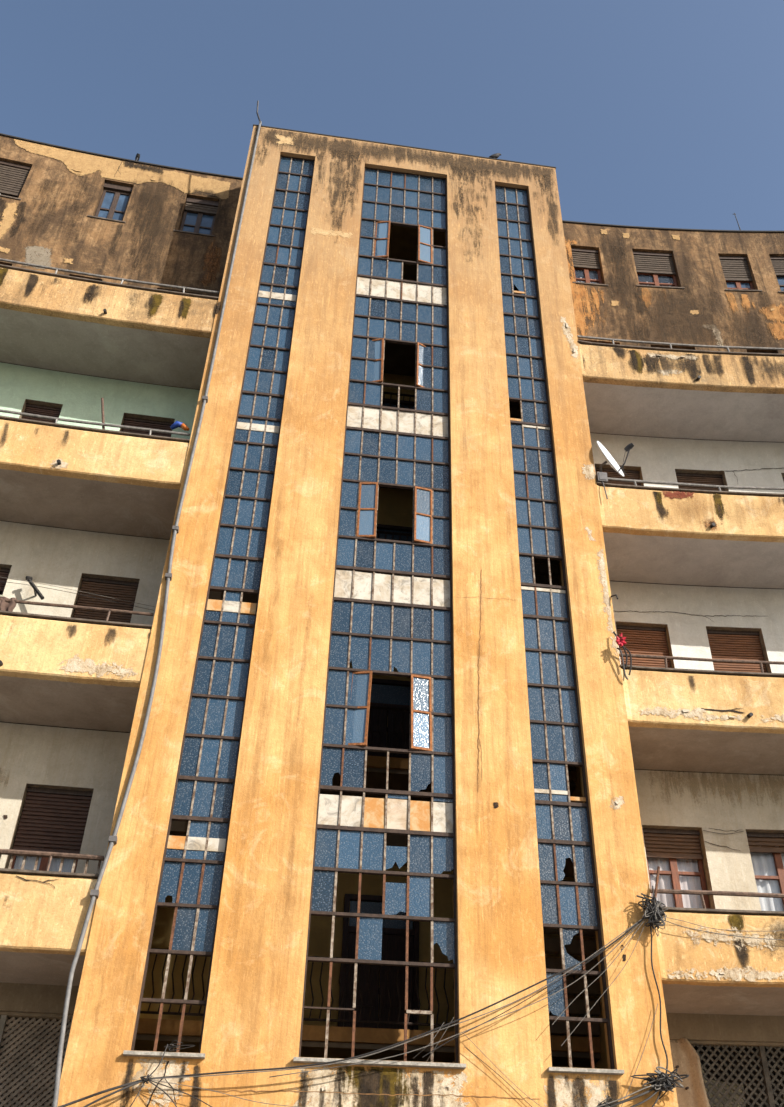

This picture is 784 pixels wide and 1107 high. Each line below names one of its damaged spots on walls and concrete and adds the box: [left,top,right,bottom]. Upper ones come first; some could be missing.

damp [257,128,558,247]
peeling [0,202,19,253]
damp [109,160,177,318]
damp [24,274,38,297]
damp [84,284,101,303]
damp [600,237,784,385]
spalling [759,303,784,340]
peeling [639,706,748,721]
peeling [683,924,777,952]
damp [728,914,749,968]
peeling [668,965,784,982]
damp [298,1066,441,1107]